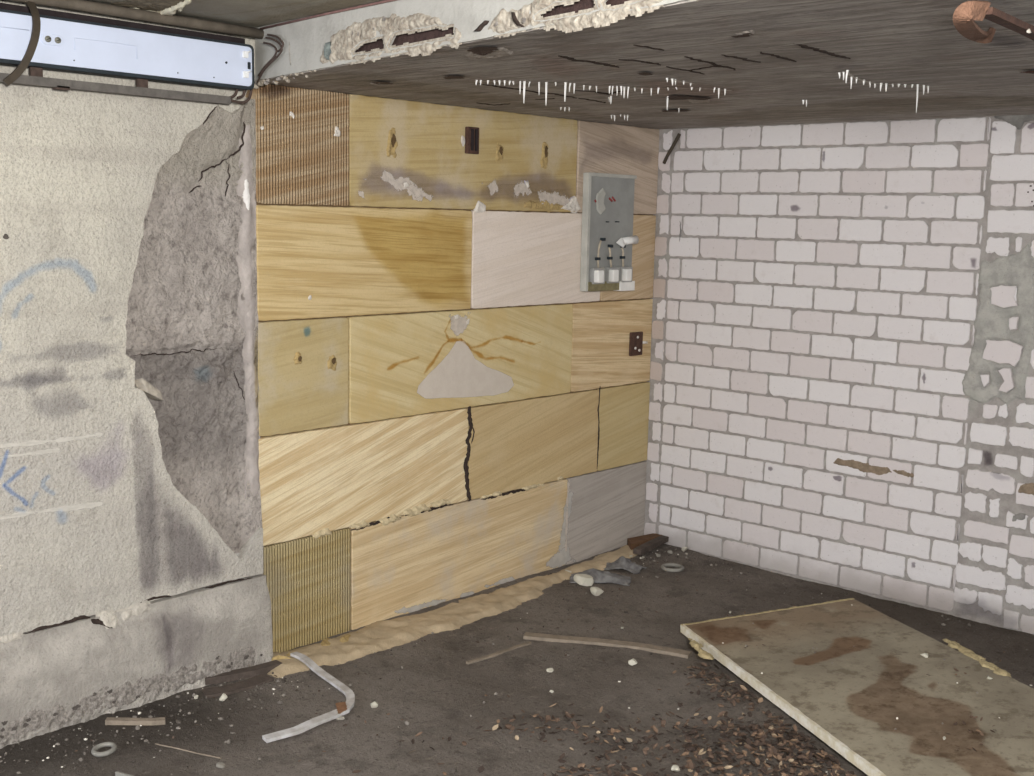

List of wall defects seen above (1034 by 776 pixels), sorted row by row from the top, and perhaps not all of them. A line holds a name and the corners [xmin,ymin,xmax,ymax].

peeling [111,0,192,16]
damp [474,78,731,121]
spalling [126,0,664,554]
crack [595,386,603,467]
crack [463,406,475,501]
crack [140,595,171,603]
crack [206,578,251,588]
crack [24,615,112,634]